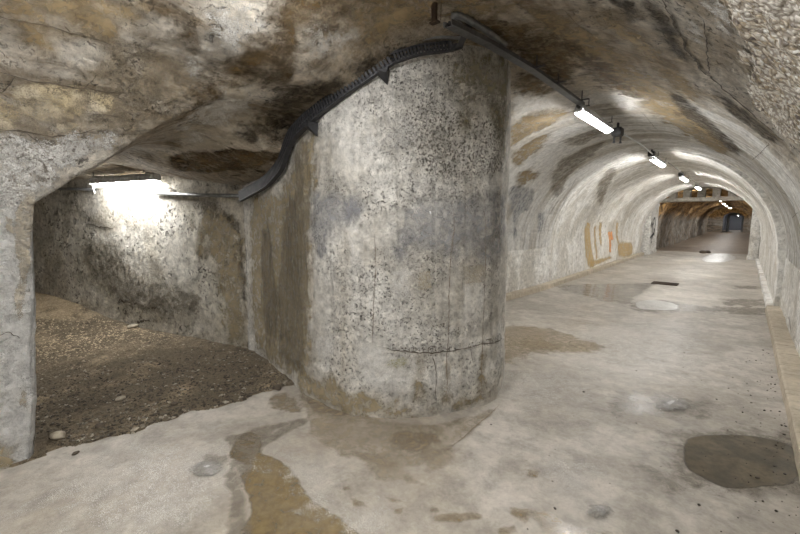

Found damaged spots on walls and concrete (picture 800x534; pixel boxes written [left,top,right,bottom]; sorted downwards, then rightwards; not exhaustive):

damp [92,0,739,260]
damp [716,91,777,143]
damp [0,130,765,534]
crack [377,338,502,394]